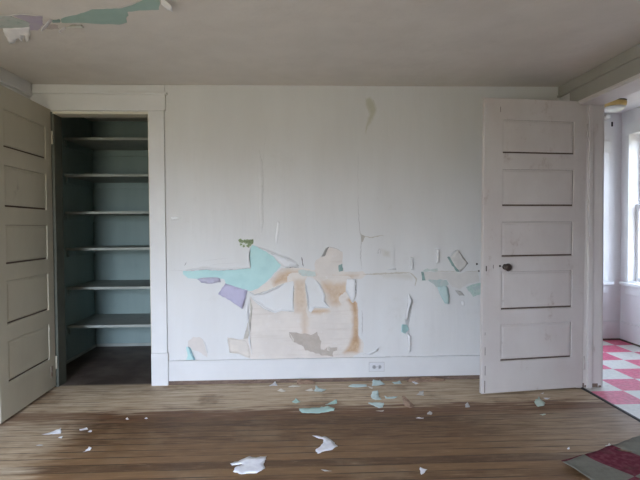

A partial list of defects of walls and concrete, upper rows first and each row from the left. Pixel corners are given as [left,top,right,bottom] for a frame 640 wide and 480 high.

peeling [0,0,173,44]
flaking render [183,245,366,360]
damp [267,268,364,358]
peeling [401,295,413,352]
peeling [421,250,481,306]